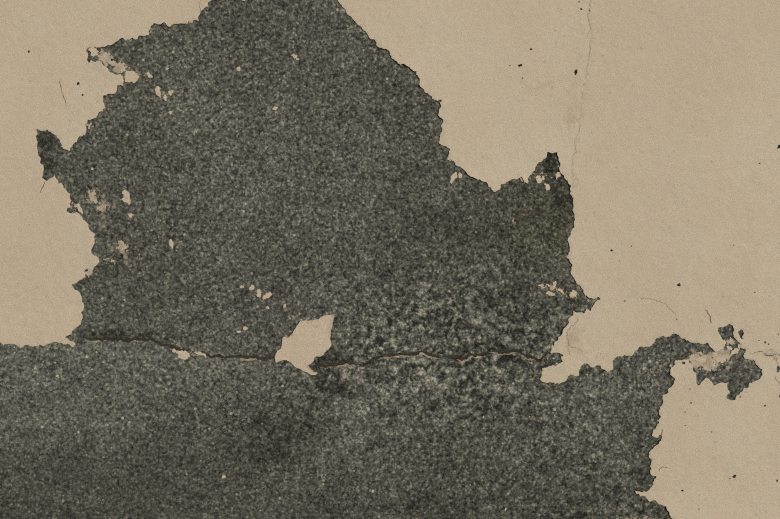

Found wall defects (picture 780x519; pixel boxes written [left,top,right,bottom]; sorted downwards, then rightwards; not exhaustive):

peeling [36,0,600,367]
crack [82,337,273,361]
peeling [0,315,762,519]
crack [314,349,545,369]